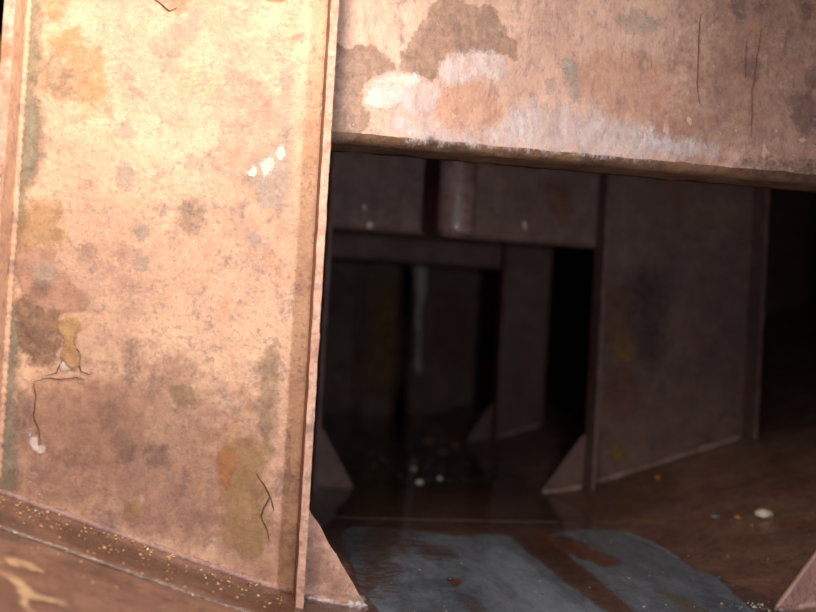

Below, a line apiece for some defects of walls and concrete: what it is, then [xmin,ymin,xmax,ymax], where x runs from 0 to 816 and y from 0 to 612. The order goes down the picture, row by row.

leakage [335,3,719,159]
spalling [17,296,81,371]
crack [33,329,91,439]
crack [256,473,274,539]